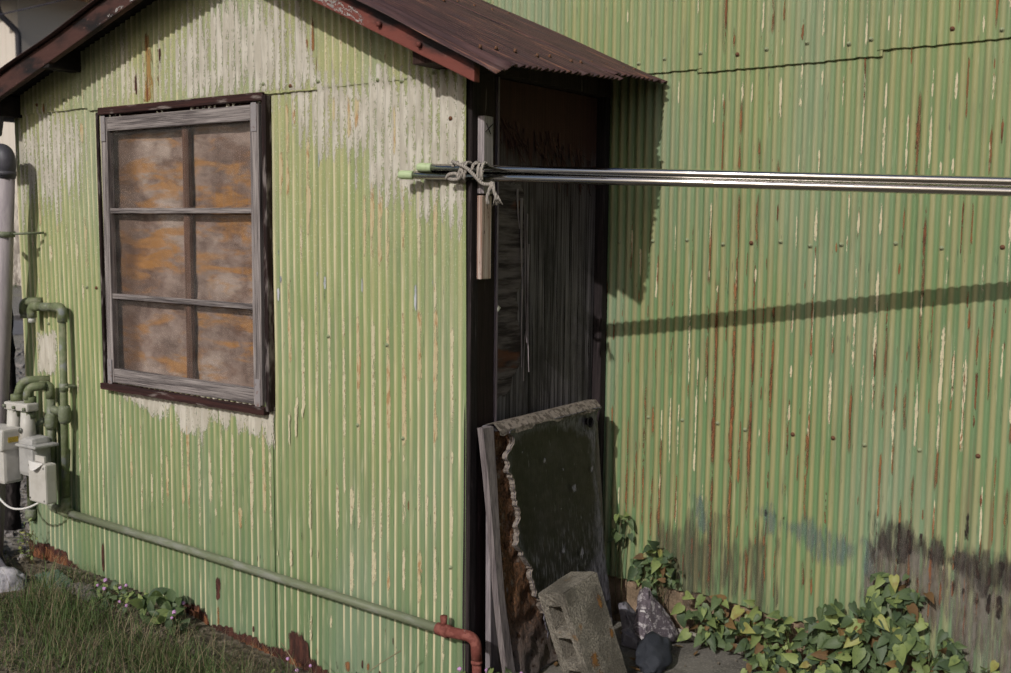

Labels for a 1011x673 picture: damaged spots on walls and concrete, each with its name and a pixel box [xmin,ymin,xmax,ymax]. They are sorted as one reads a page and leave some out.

corrosion [134,34,161,102]
peeling [15,0,465,261]
corrosion [905,96,921,175]
corrosion [988,120,1004,175]
corrosion [960,197,974,254]
corrosion [952,295,1006,449]
peeling [118,298,406,587]
peeling [418,475,436,530]
corrosion [30,540,79,569]
water stain [864,522,1011,673]